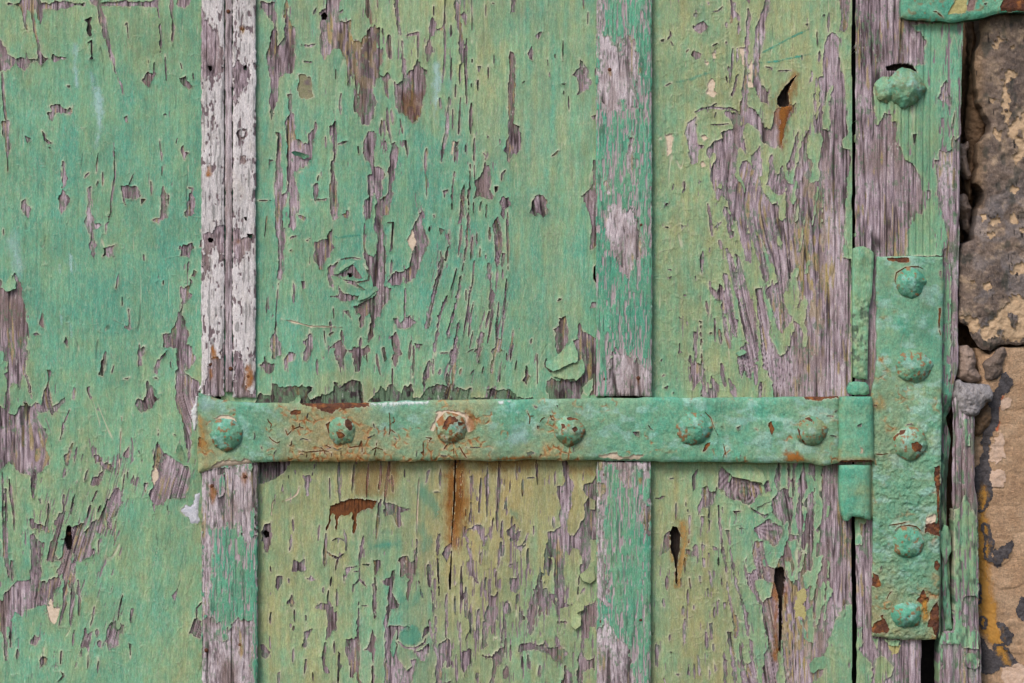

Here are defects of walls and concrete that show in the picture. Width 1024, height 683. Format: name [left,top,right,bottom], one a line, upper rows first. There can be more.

rust [779,106,792,145]
peeling [0,0,671,683]
peeling [663,0,1024,683]
rust [290,402,372,443]
rust [440,414,474,432]
rust [326,498,377,534]
crack [254,413,556,683]
rust [447,461,466,542]
rust [922,463,941,538]
crack [662,552,723,679]
rust [872,612,892,635]
rust [915,587,939,637]